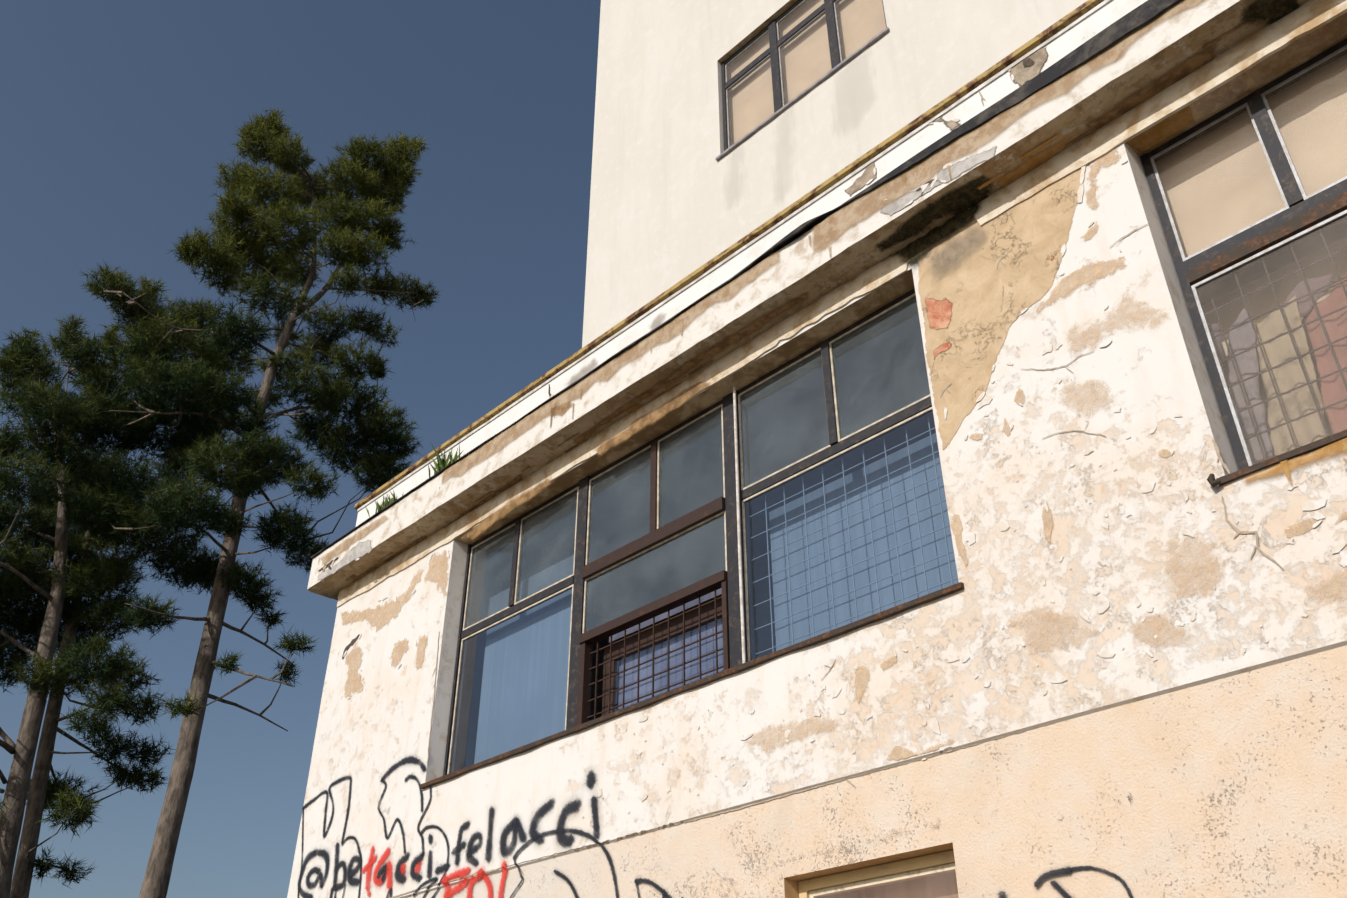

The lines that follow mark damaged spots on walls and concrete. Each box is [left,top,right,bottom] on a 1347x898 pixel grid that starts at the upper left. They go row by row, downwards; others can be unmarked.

water stain [877,0,1300,264]
spalling [880,145,997,216]
flaking render [918,12,1347,450]
corrosion [1245,437,1347,485]
spalling [318,540,372,580]
peeling [951,515,976,566]
peeling [1042,502,1053,544]
crack [1212,439,1283,570]
peeling [1285,499,1347,544]
peeling [341,550,449,632]
peeling [344,643,364,699]
peeling [390,635,427,669]